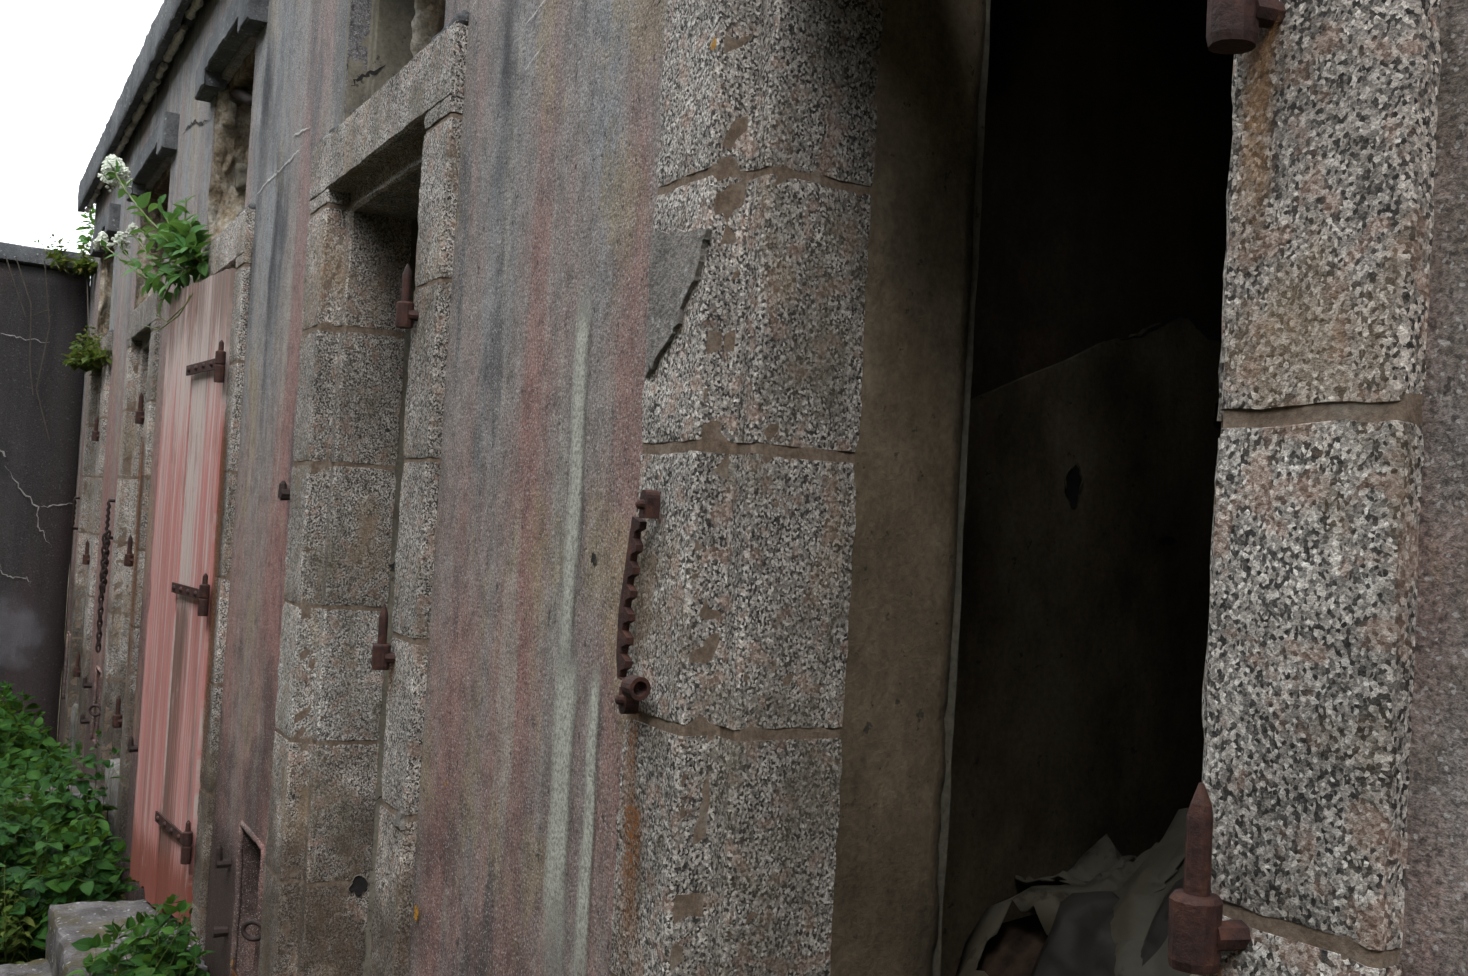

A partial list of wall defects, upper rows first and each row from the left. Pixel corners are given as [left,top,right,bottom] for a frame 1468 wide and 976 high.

crack [183,119,208,134]
crack [0,450,73,547]